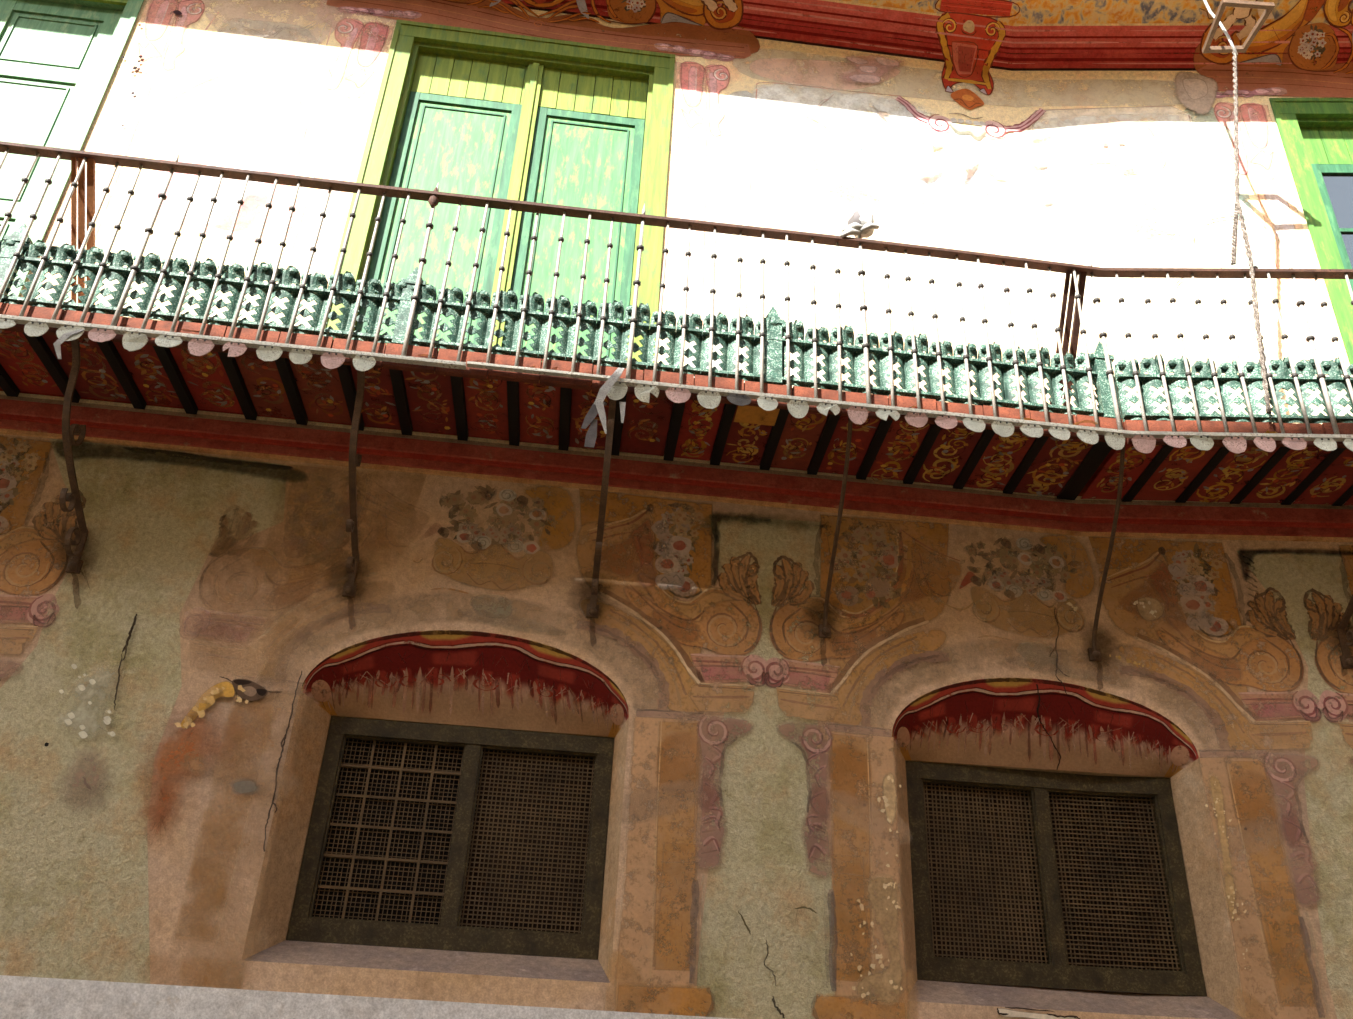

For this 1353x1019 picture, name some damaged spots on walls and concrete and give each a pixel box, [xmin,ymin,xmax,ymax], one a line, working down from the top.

crack [263,671,302,852]
crack [1036,608,1069,770]
crack [738,911,785,1018]